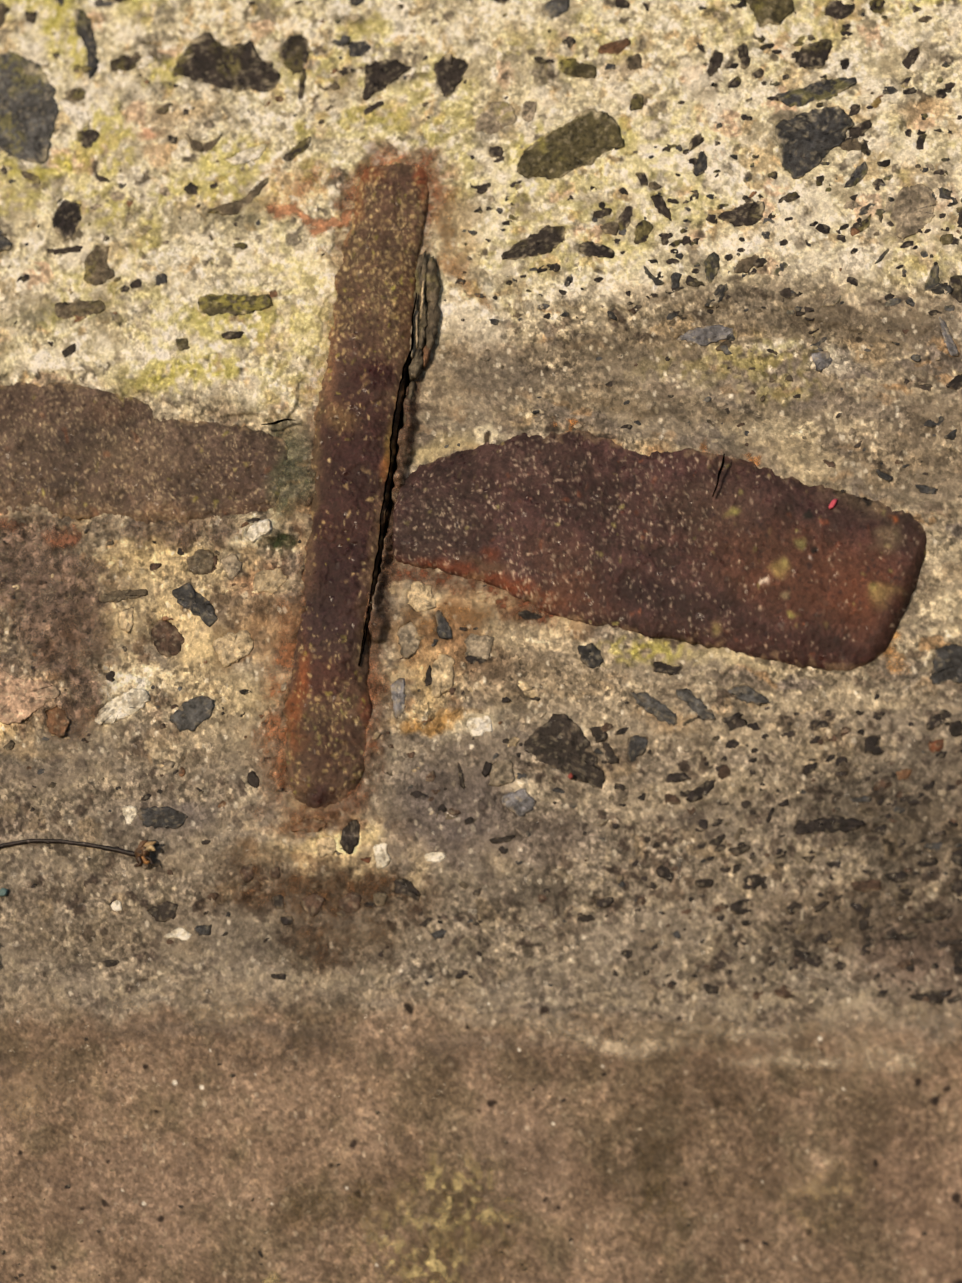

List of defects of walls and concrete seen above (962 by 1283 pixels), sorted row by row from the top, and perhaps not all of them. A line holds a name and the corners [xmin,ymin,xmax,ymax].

corrosion [268,149,449,251]
crack [358,293,417,666]
corrosion [364,382,554,704]
corrosion [263,621,300,790]